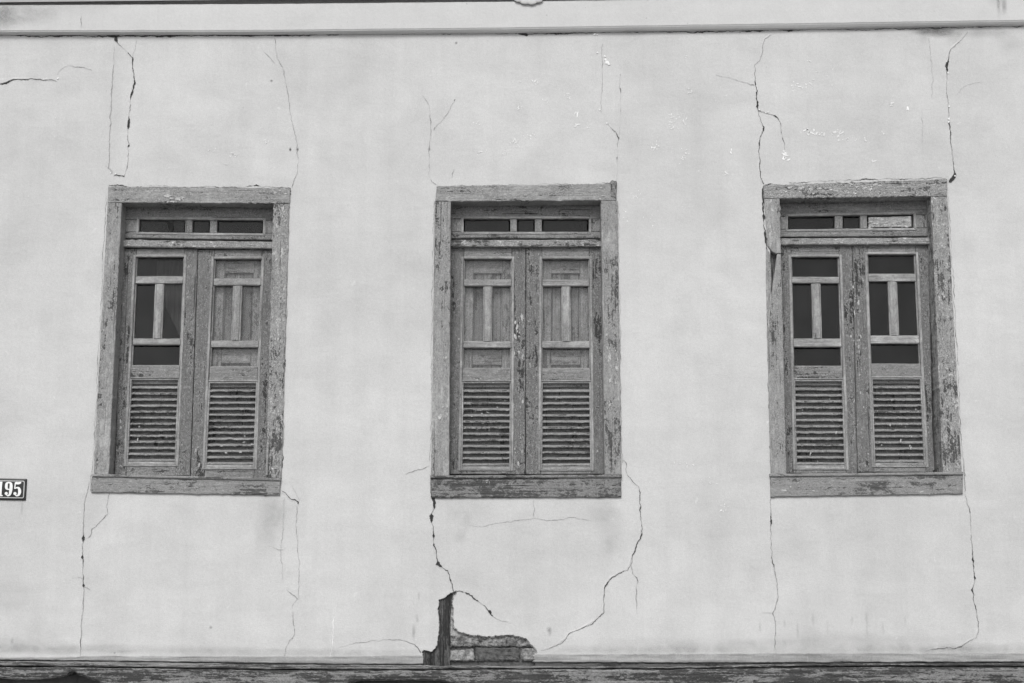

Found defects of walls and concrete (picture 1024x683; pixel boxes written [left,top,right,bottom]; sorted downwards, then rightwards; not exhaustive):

crack [0,19,342,186]
crack [370,31,404,39]
crack [505,26,1021,184]
crack [78,481,110,656]
crack [273,486,300,657]
crack [429,498,507,622]
flaking render [422,591,537,671]
crack [541,460,643,651]
crack [768,497,778,653]
crack [926,494,979,651]